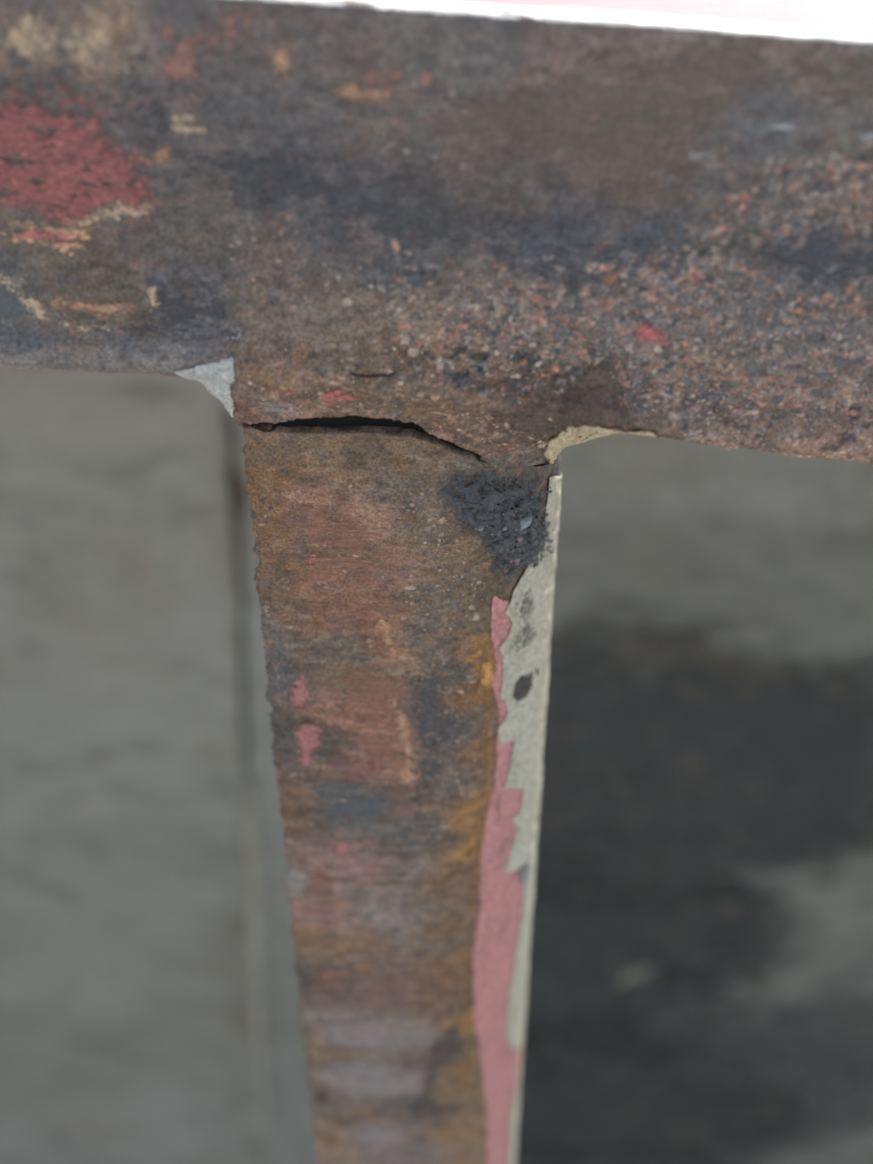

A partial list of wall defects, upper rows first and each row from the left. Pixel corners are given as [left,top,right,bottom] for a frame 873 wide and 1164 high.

rust [437,470,554,589]
peeling [472,424,658,1164]
damp [515,621,873,1164]